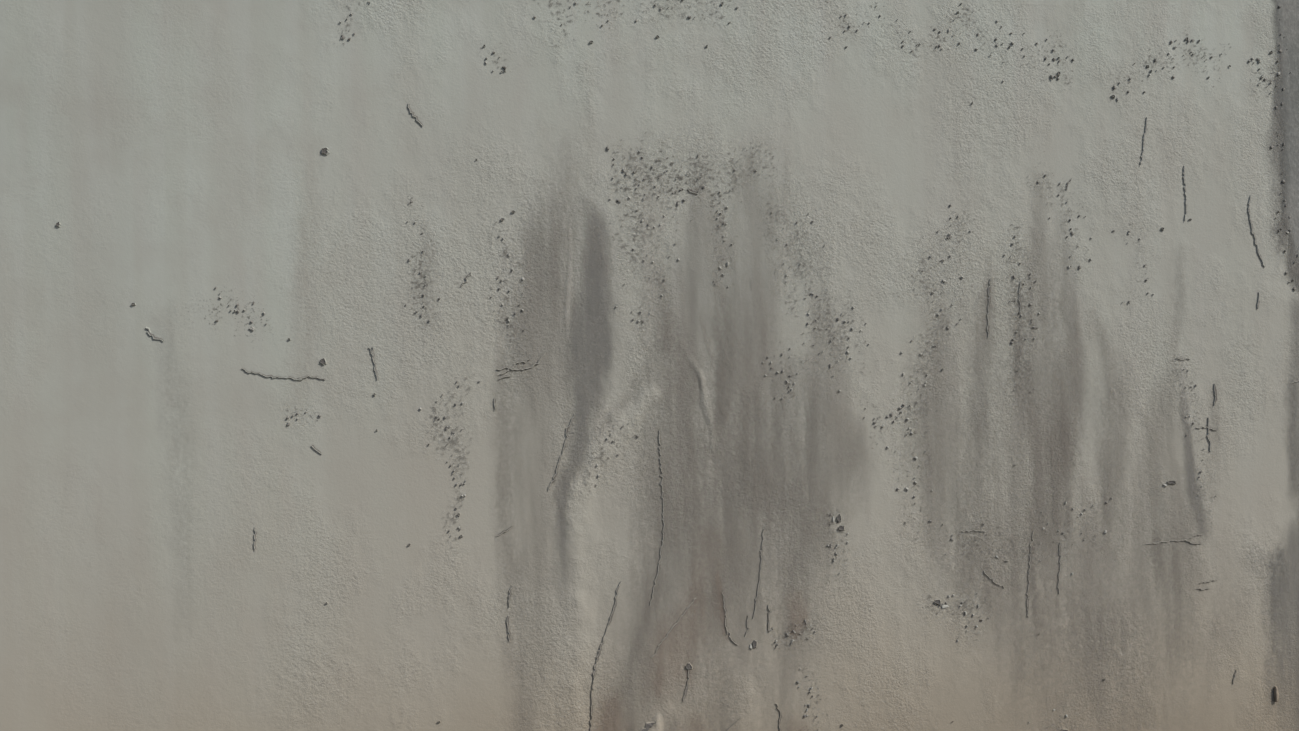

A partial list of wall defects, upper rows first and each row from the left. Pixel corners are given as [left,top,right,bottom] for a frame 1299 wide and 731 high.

leakage [575,223,610,434]
crack [649,430,665,606]
crack [589,582,621,731]
crack [639,721,656,731]
crack [682,670,690,702]